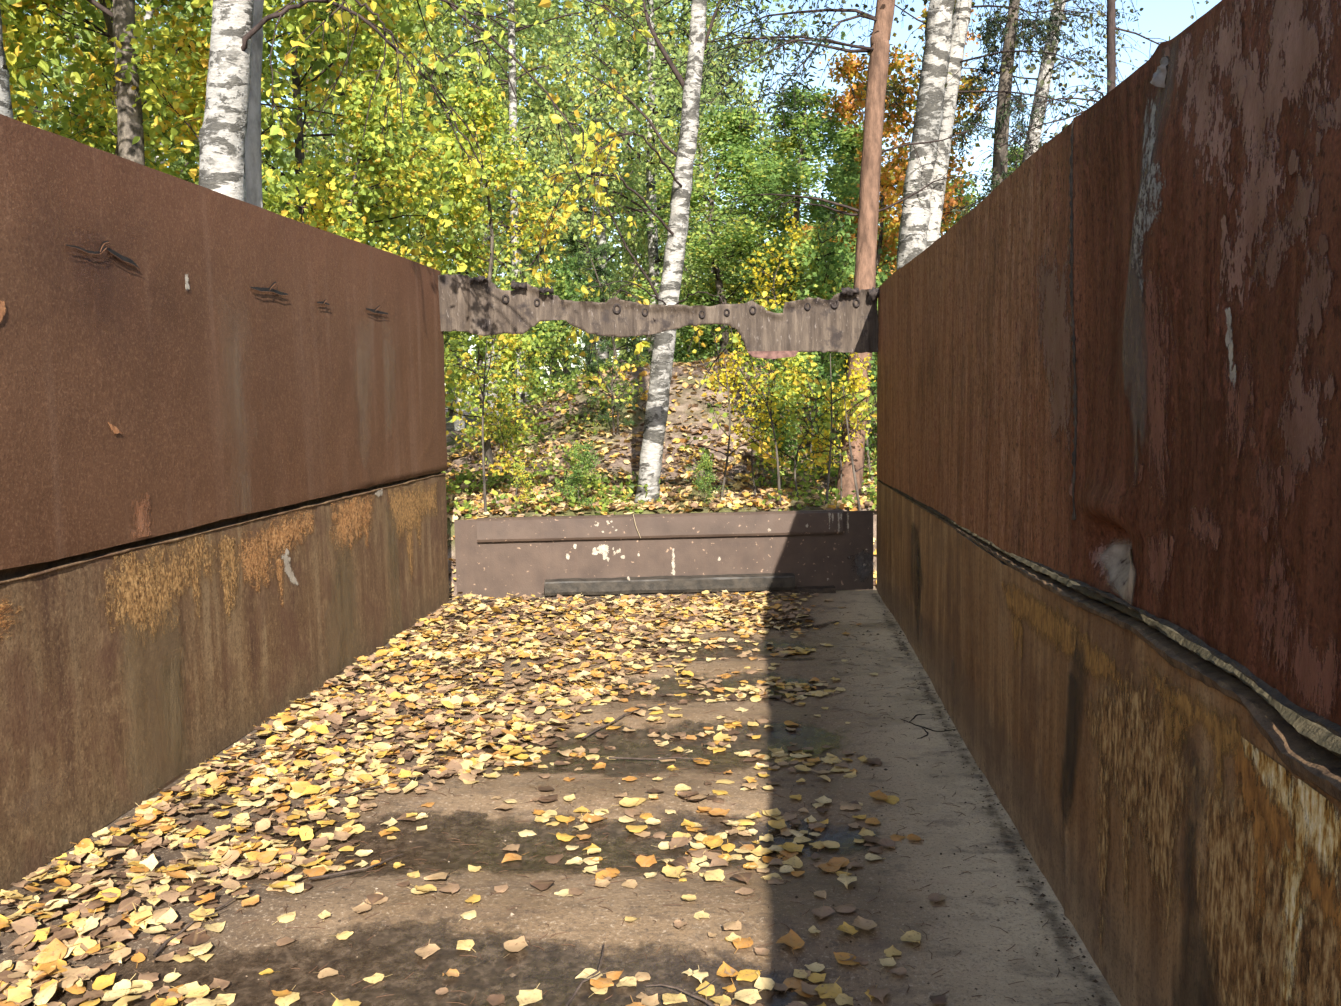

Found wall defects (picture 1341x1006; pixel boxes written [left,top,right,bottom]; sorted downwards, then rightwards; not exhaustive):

peeling [1131,243,1174,498]
peeling [1165,0,1341,720]
corrosion [104,483,438,647]
peeling [1148,531,1175,598]
corrosion [1085,666,1341,1006]